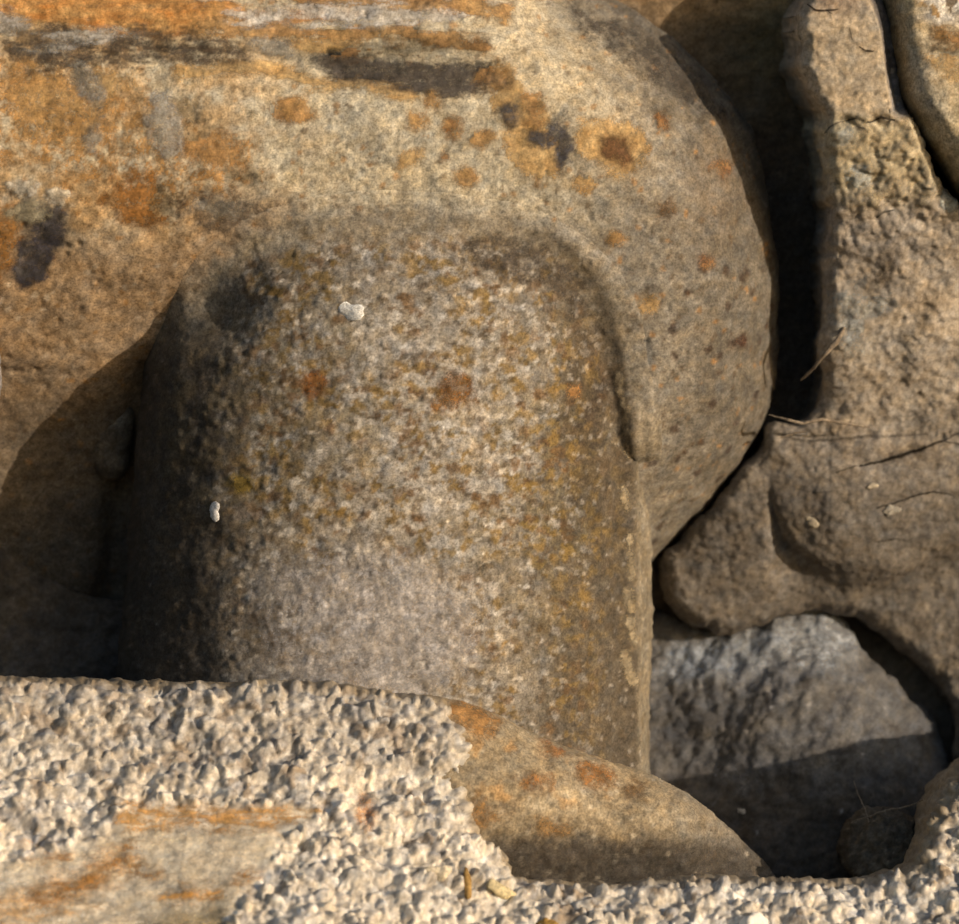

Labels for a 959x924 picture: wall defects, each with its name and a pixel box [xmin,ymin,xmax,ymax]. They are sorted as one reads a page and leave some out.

crack [810,433,959,473]